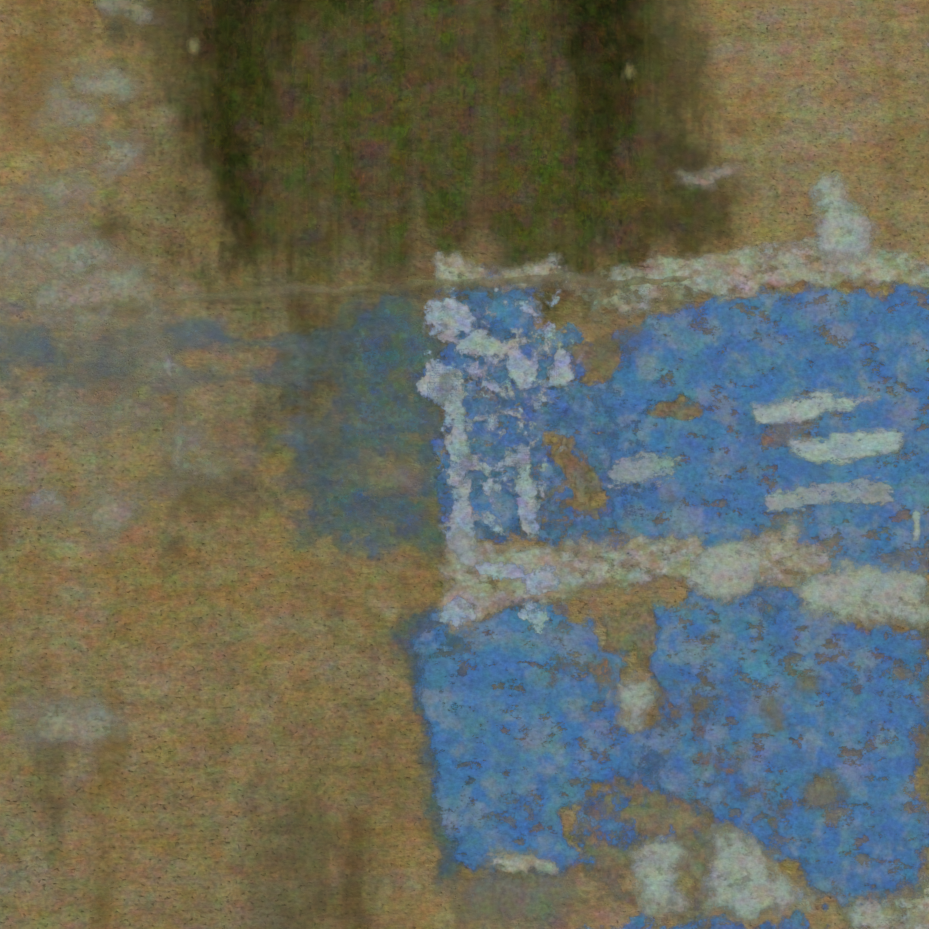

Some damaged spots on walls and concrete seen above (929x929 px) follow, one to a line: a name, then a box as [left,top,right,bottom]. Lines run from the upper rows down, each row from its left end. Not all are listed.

damp [48,66,131,126]
damp [98,0,150,21]
damp [560,0,640,154]
damp [683,165,735,186]
peeling [420,272,929,575]
peeling [394,580,929,929]